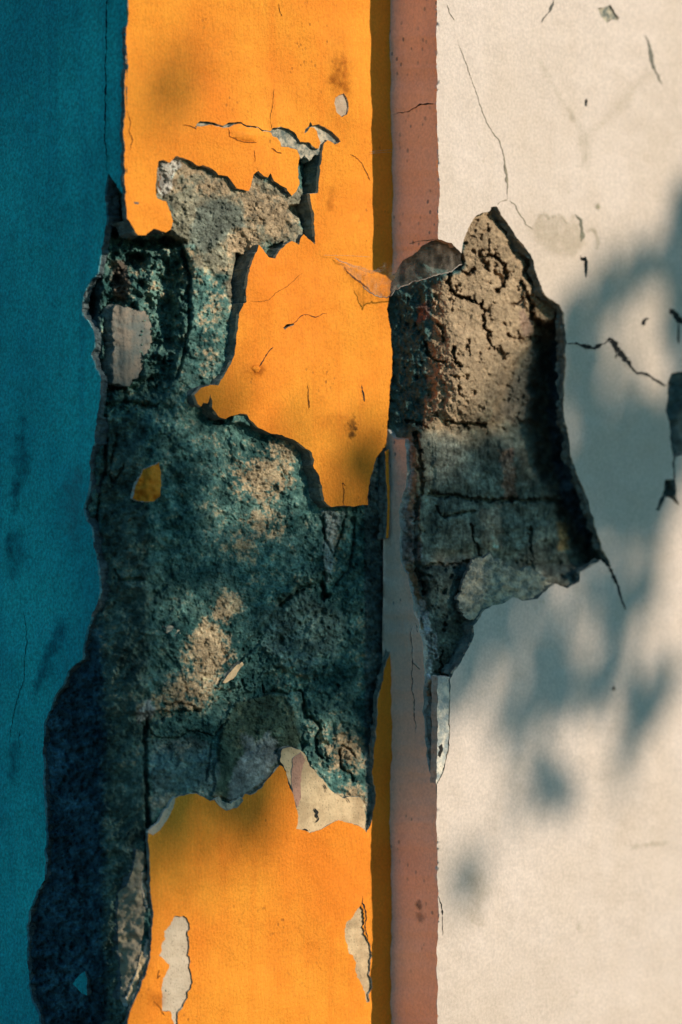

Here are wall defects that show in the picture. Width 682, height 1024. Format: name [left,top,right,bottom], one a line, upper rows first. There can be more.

peeling [334,94,347,116]
crack [394,102,434,115]
crack [447,5,531,228]
crack [566,335,669,387]
spalling [666,372,682,454]
spalling [387,210,606,785]
spalling [30,125,386,1024]